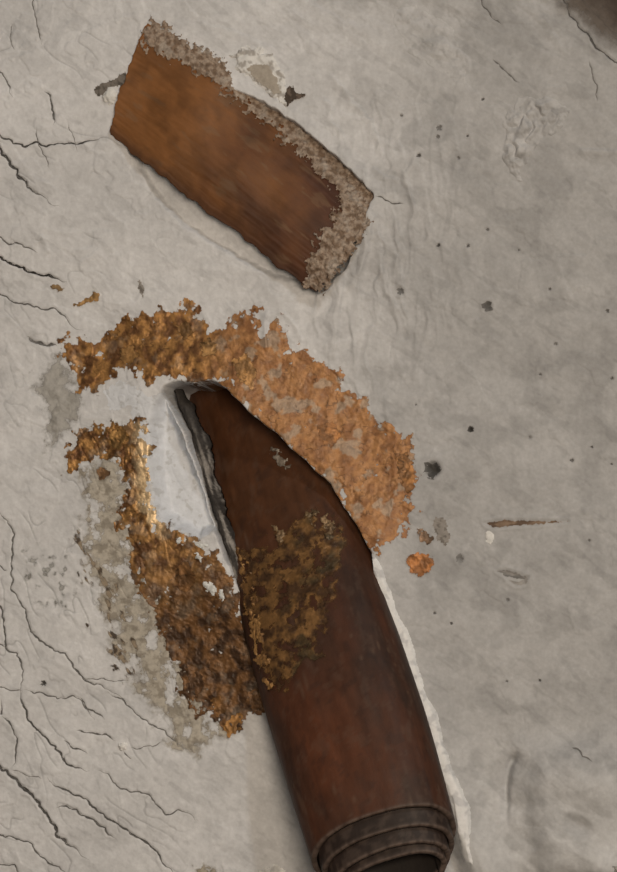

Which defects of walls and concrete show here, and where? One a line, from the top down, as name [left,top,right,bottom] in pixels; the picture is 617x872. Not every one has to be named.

leakage [565,0,617,40]
spalling [94,73,126,105]
spalling [229,45,305,107]
crack [0,91,106,206]
crack [0,237,66,282]
crack [0,294,79,330]
leakage [35,352,82,444]
spalling [486,519,568,544]
corrosion [74,530,138,677]
leakage [79,458,228,756]
crack [0,513,194,872]
spalling [372,557,473,865]